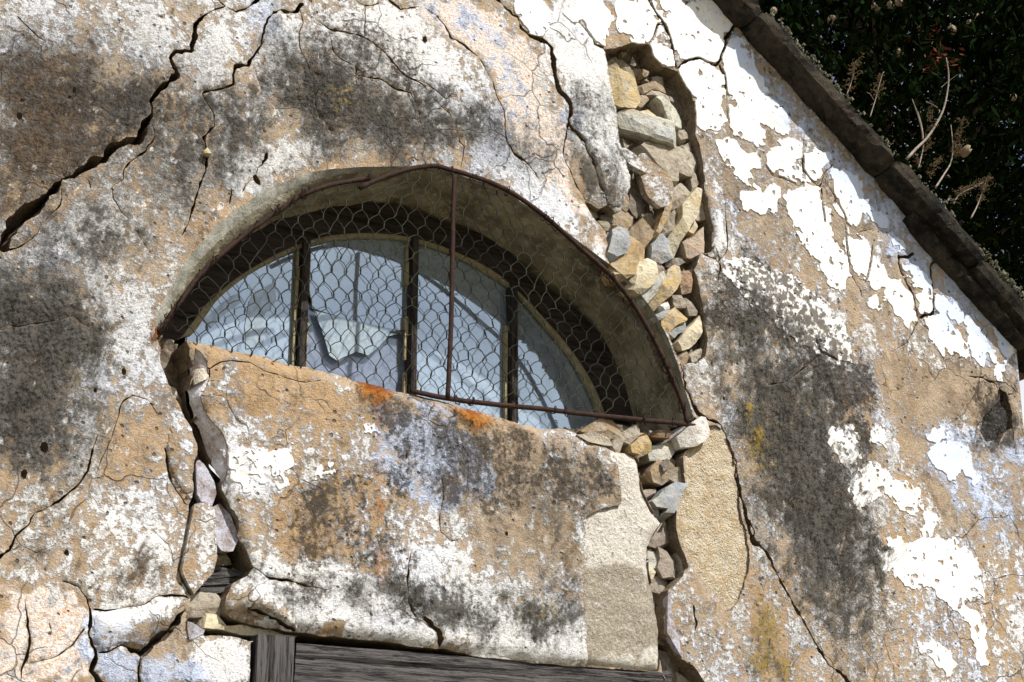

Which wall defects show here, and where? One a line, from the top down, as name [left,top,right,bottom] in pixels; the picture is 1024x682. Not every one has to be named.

water stain [0,16,509,487]
crack [0,0,538,253]
crack [496,0,607,203]
peeling [563,0,1015,445]
crack [20,581,189,682]
spalling [156,335,307,640]
rust [357,381,395,421]
water stain [344,570,500,651]
rust [450,403,496,434]
crack [676,363,851,682]
water stain [696,264,903,681]
peeling [825,424,989,666]